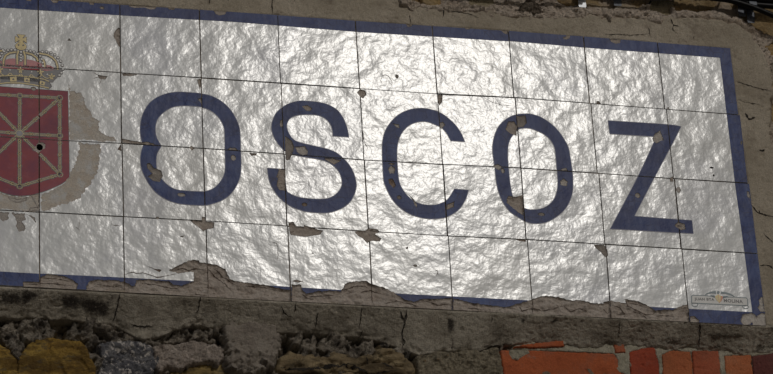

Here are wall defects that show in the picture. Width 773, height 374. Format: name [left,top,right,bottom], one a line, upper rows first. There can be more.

peeling [288,222,323,237]
peeling [354,228,382,243]
spalling [23,260,699,322]
peeling [741,297,766,326]
crack [399,310,407,348]
crack [281,357,396,374]